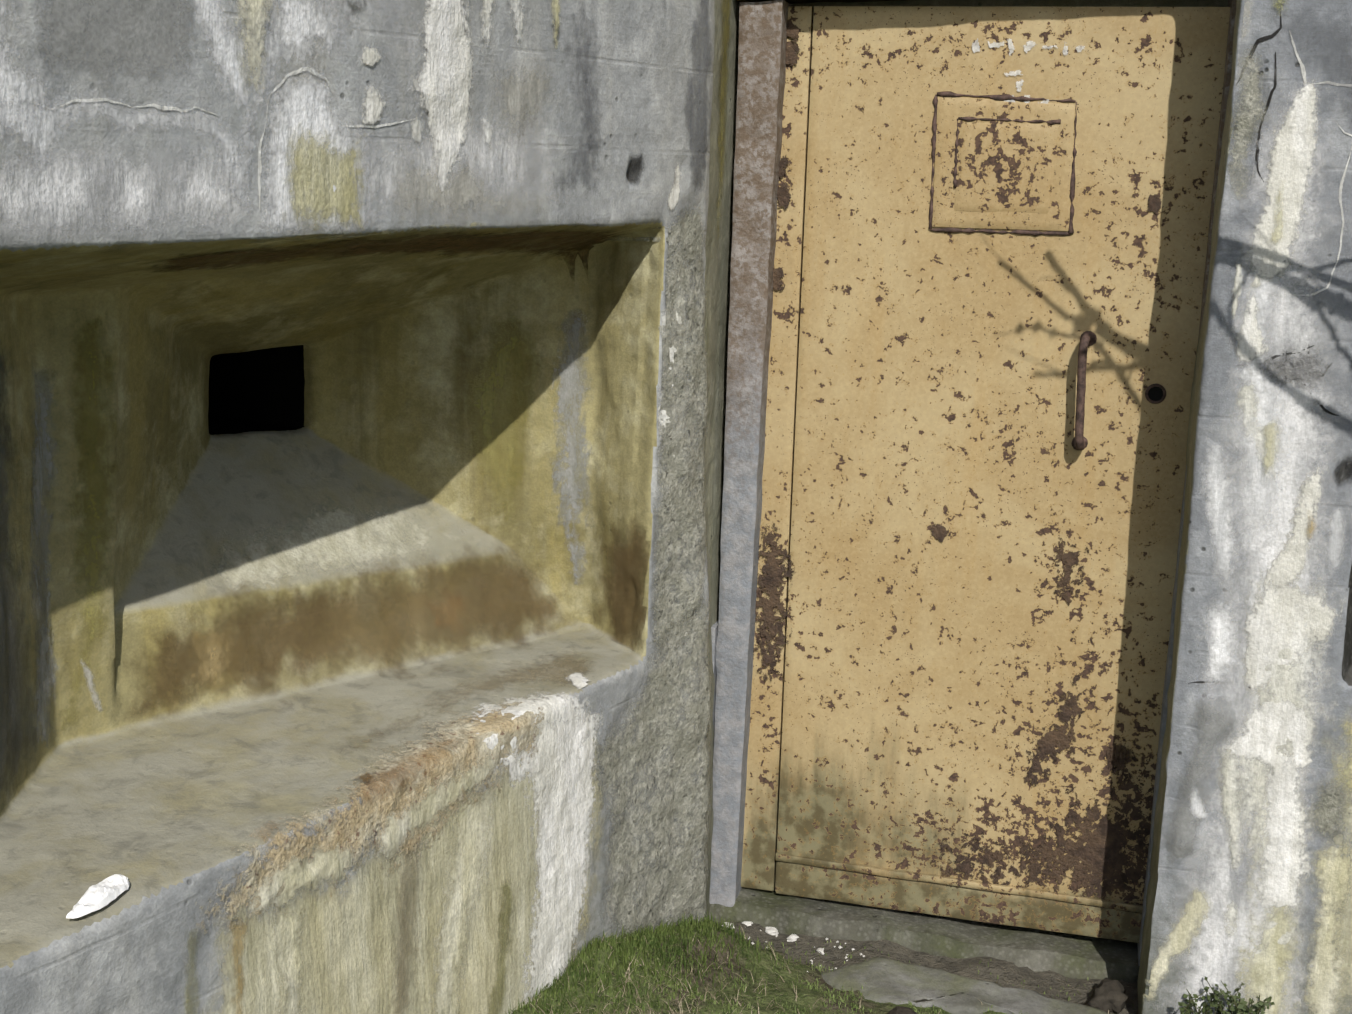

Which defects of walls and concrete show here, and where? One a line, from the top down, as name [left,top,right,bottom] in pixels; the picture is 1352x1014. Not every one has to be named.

leakage [0,0,518,233]
leakage [511,0,523,39]
crack [1236,10,1282,182]
crack [1284,121,1352,296]
leakage [0,356,54,779]
leakage [553,316,589,582]
rust [753,523,796,681]
rust [930,524,951,542]
rust [1051,537,1089,605]
rust [1023,674,1087,786]
leakage [201,692,602,1014]
rust [930,742,1154,914]